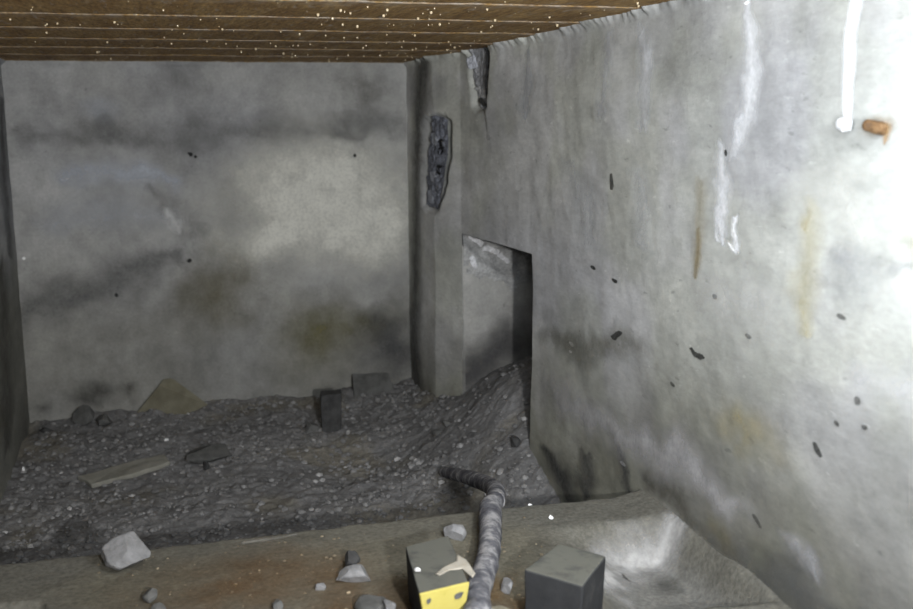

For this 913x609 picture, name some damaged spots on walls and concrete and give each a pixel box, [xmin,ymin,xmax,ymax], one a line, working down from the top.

spalling [426,115,449,209]
leakage [715,0,758,253]